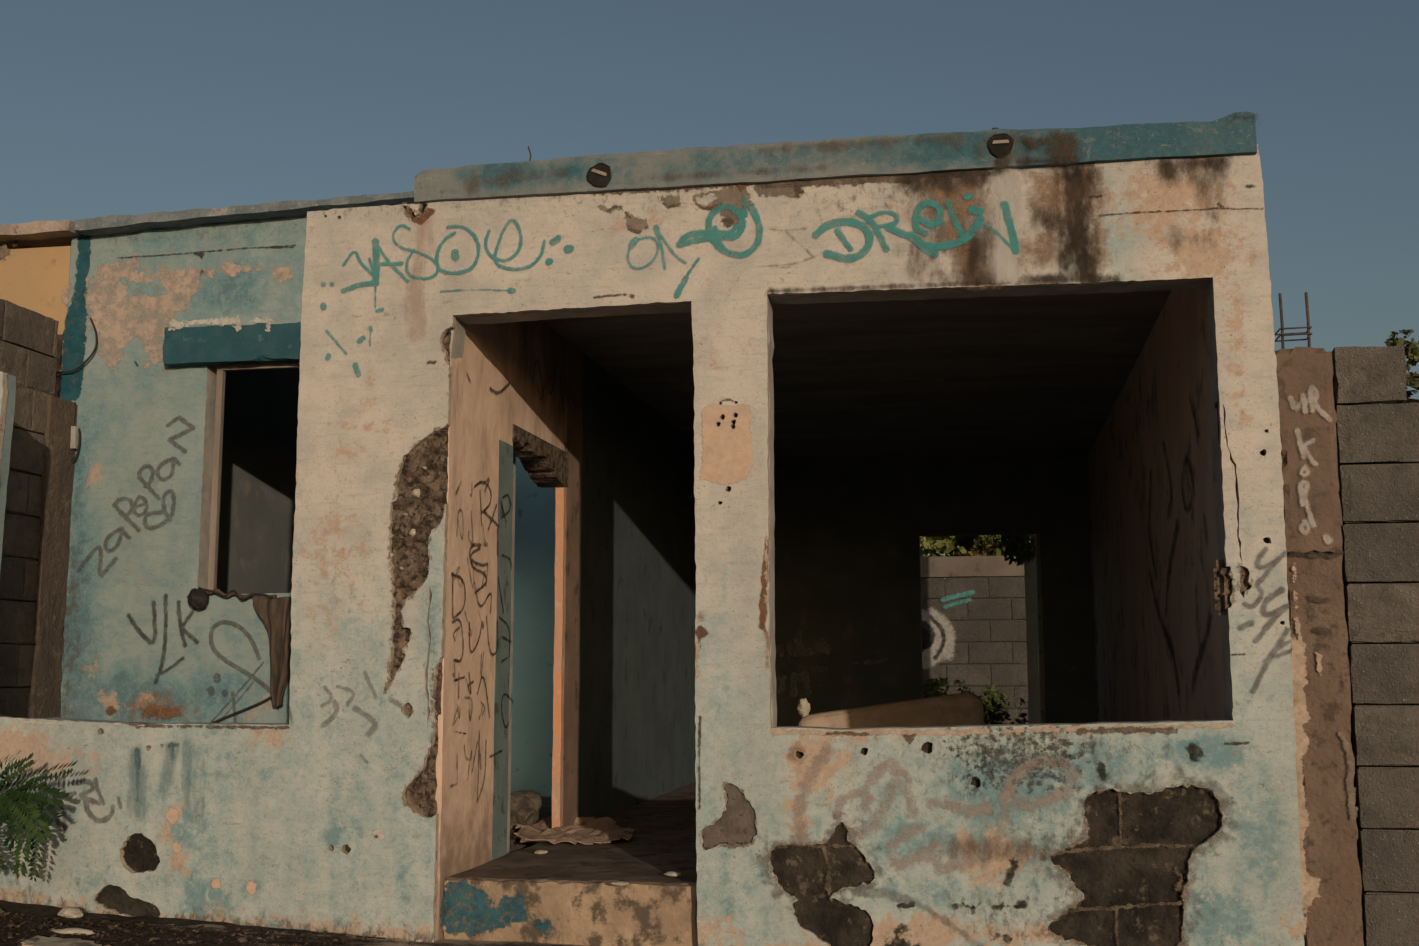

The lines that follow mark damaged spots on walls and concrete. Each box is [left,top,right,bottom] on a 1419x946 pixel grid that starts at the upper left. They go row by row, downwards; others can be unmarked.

water stain [1160,157,1227,191]
peeling [61,253,294,371]
crack [1214,401,1240,546]
flaking render [383,426,449,694]
flaking render [1213,560,1253,615]
flaking render [402,659,443,817]
flaking render [96,885,161,917]
flaking render [123,833,182,872]
flaking render [702,782,875,946]
flaking render [1048,783,1224,946]